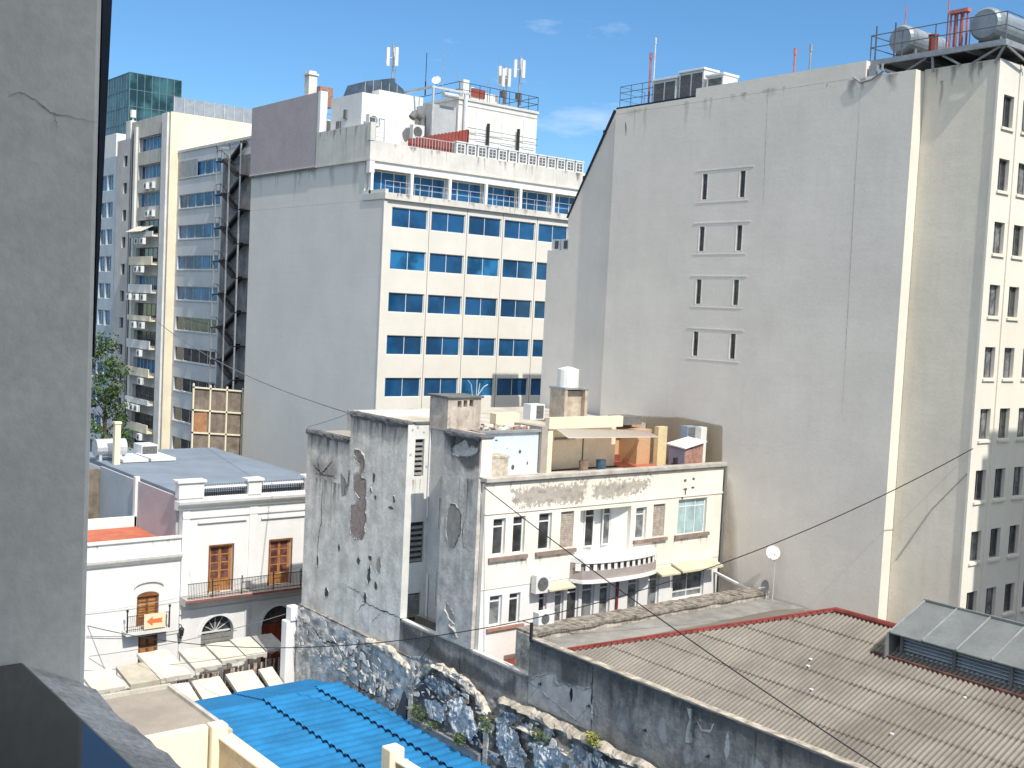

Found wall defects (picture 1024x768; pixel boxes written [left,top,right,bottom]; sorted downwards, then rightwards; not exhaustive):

crack [10,92,95,128]
flaking render [452,440,479,458]
crack [314,461,336,554]
spalling [341,448,377,541]
spalling [446,502,462,550]
peeling [510,478,651,509]